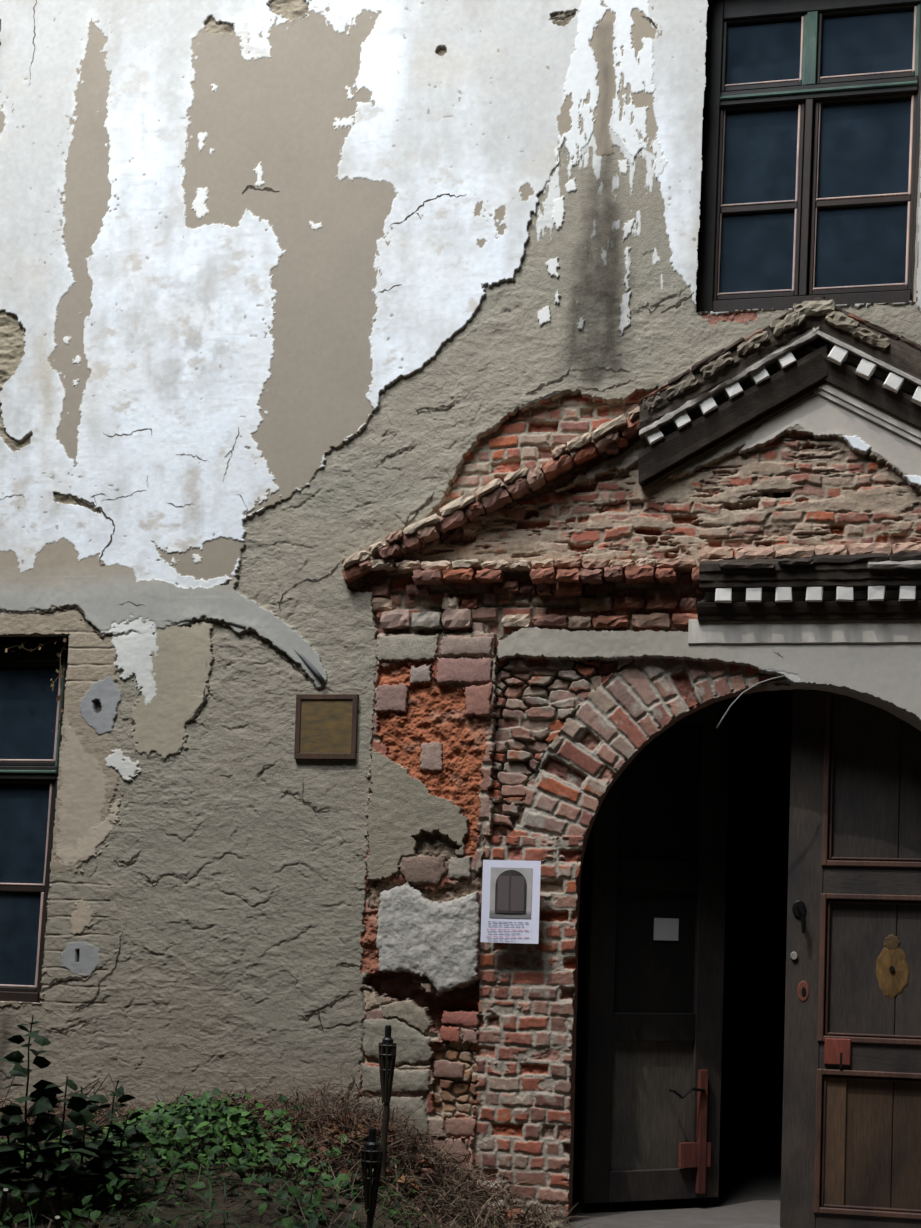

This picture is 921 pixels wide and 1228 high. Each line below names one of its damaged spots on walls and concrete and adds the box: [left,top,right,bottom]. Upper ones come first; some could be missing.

crack [29,0,37,79]
damp [536,0,668,376]
damp [653,248,673,288]
flaking render [842,302,921,345]
flaking render [901,382,917,395]
flaking render [396,419,921,585]
flaking render [0,0,789,1122]
crack [257,764,328,813]
crack [114,852,187,886]
flaking render [355,632,791,1223]
crack [41,924,127,1034]
crack [297,963,358,1032]